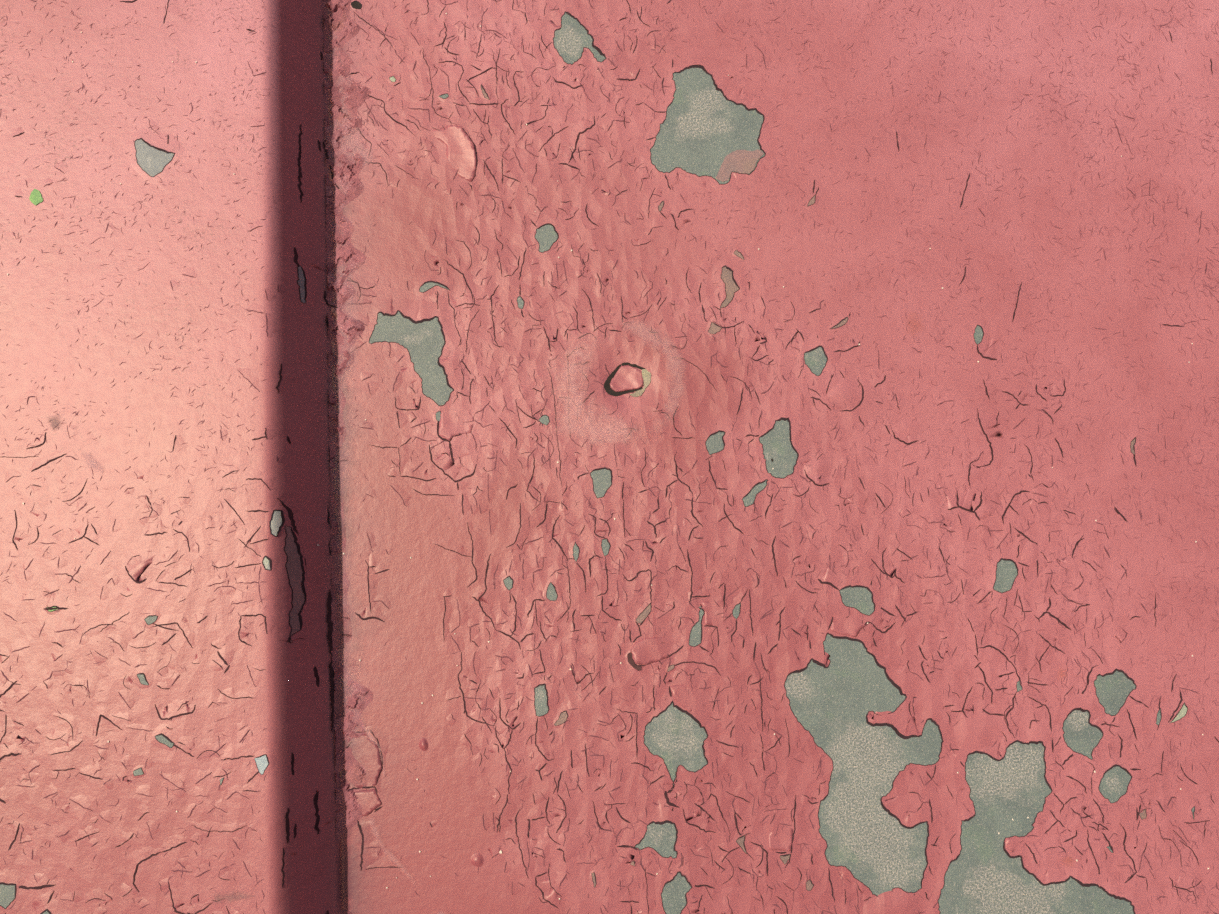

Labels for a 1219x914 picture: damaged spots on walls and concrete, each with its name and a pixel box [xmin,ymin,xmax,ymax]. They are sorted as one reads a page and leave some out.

peeling [545,0,621,73]
peeling [125,129,185,184]
peeling [640,45,778,191]
peeling [359,269,464,423]
peeling [697,417,734,460]
crack [291,0,1219,914]
peeling [735,397,812,512]
spalling [258,503,324,643]
peeling [625,650,644,672]
peeling [681,601,713,652]
peeling [630,663,721,914]
peeling [768,568,1153,914]